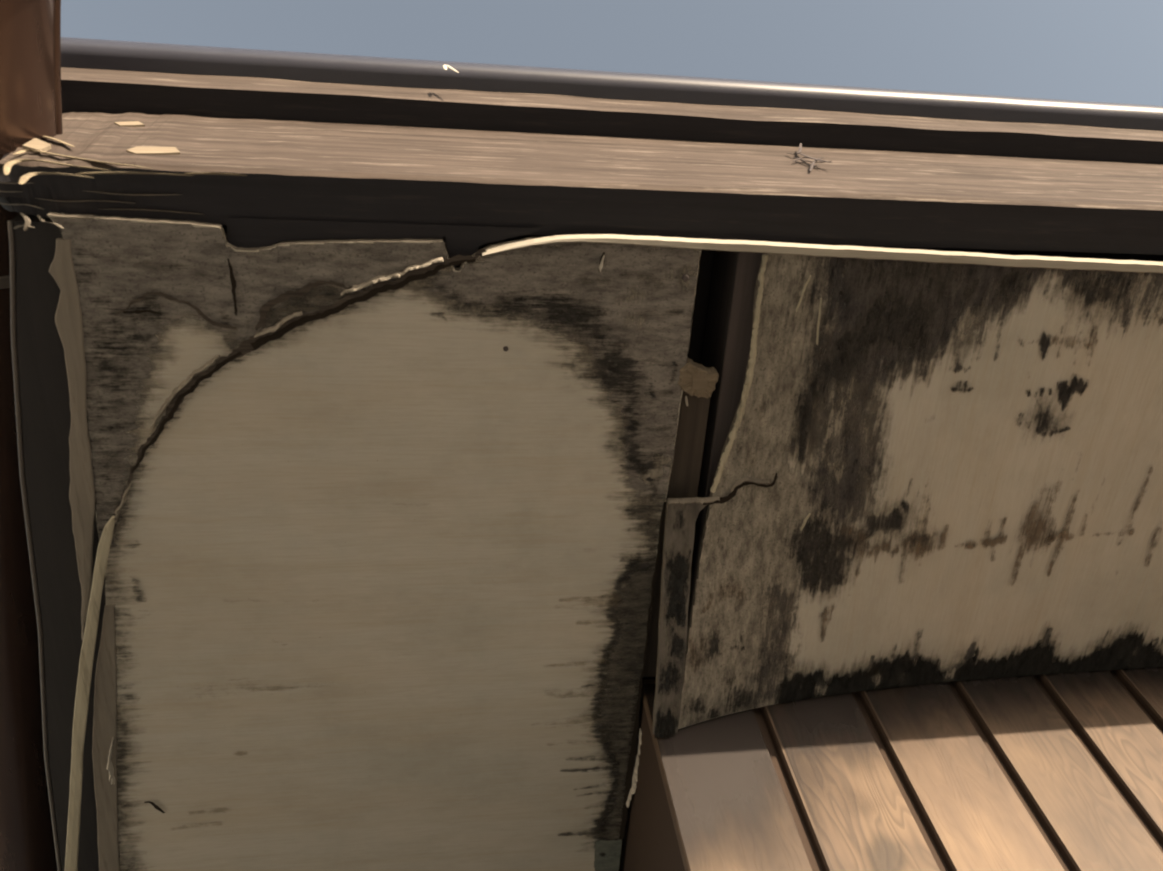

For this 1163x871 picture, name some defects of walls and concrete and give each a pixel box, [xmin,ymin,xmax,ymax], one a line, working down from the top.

crack [113,249,487,533]
leakage [52,218,788,869]
leakage [765,256,1163,645]
leakage [767,628,1163,787]